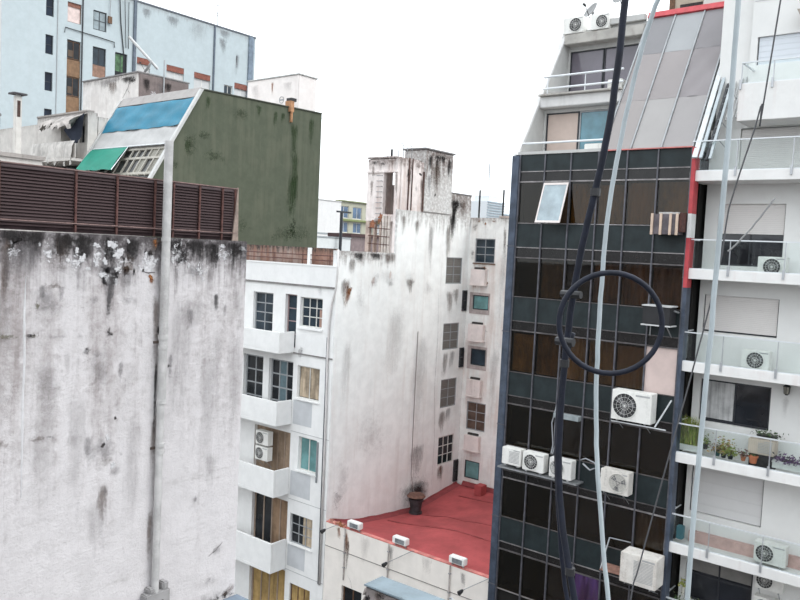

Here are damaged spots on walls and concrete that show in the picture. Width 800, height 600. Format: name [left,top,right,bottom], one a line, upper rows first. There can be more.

leakage [429,155,451,184]
leakage [4,230,43,258]
leakage [57,234,92,257]
peeling [38,239,158,285]
leakage [127,240,139,262]
leakage [170,239,242,263]